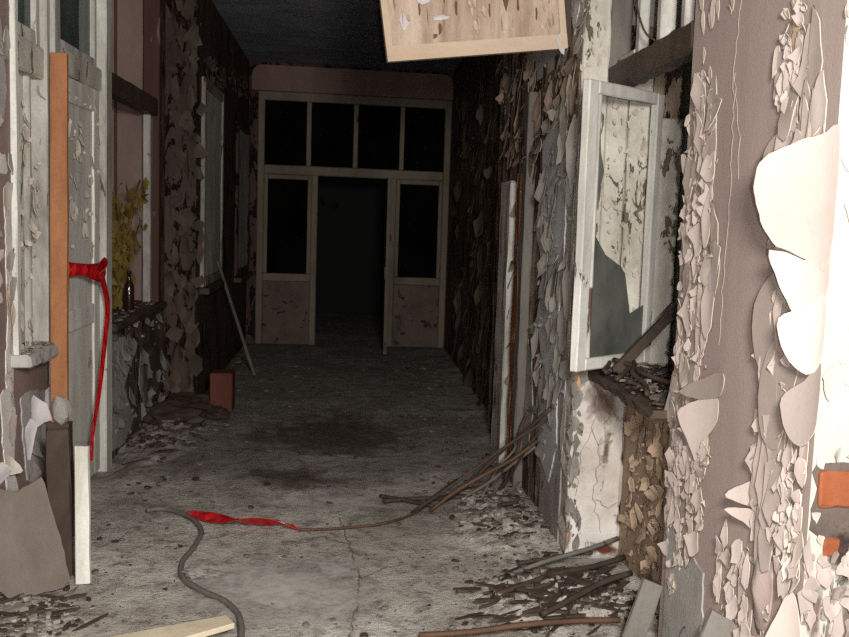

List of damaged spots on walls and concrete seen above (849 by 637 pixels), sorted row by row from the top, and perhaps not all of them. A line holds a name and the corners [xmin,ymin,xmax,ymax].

peeling [0,19,11,127]
peeling [0,99,52,492]
peeling [112,8,252,453]
spalling [450,0,609,551]
peeling [603,183,645,258]
peeling [618,0,849,637]